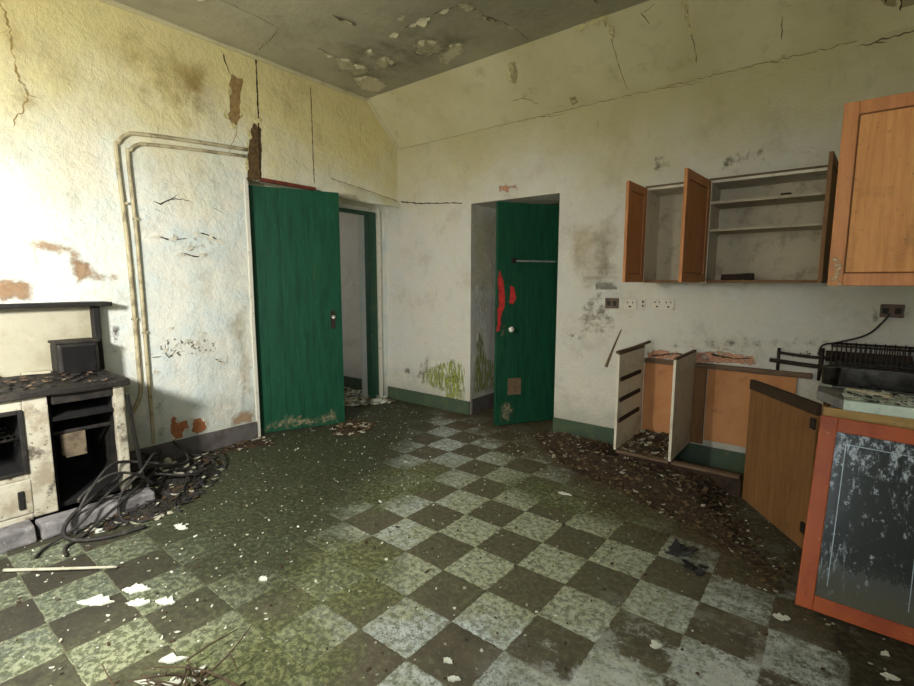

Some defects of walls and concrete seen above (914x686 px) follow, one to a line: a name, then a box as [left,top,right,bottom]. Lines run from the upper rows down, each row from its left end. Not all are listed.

peeling [389,1,525,38]
peeling [869,0,914,11]
crack [0,4,34,127]
peeling [318,48,394,94]
peeling [412,40,465,66]
crack [402,5,914,149]
flaking render [223,53,262,171]
spalling [169,414,208,441]